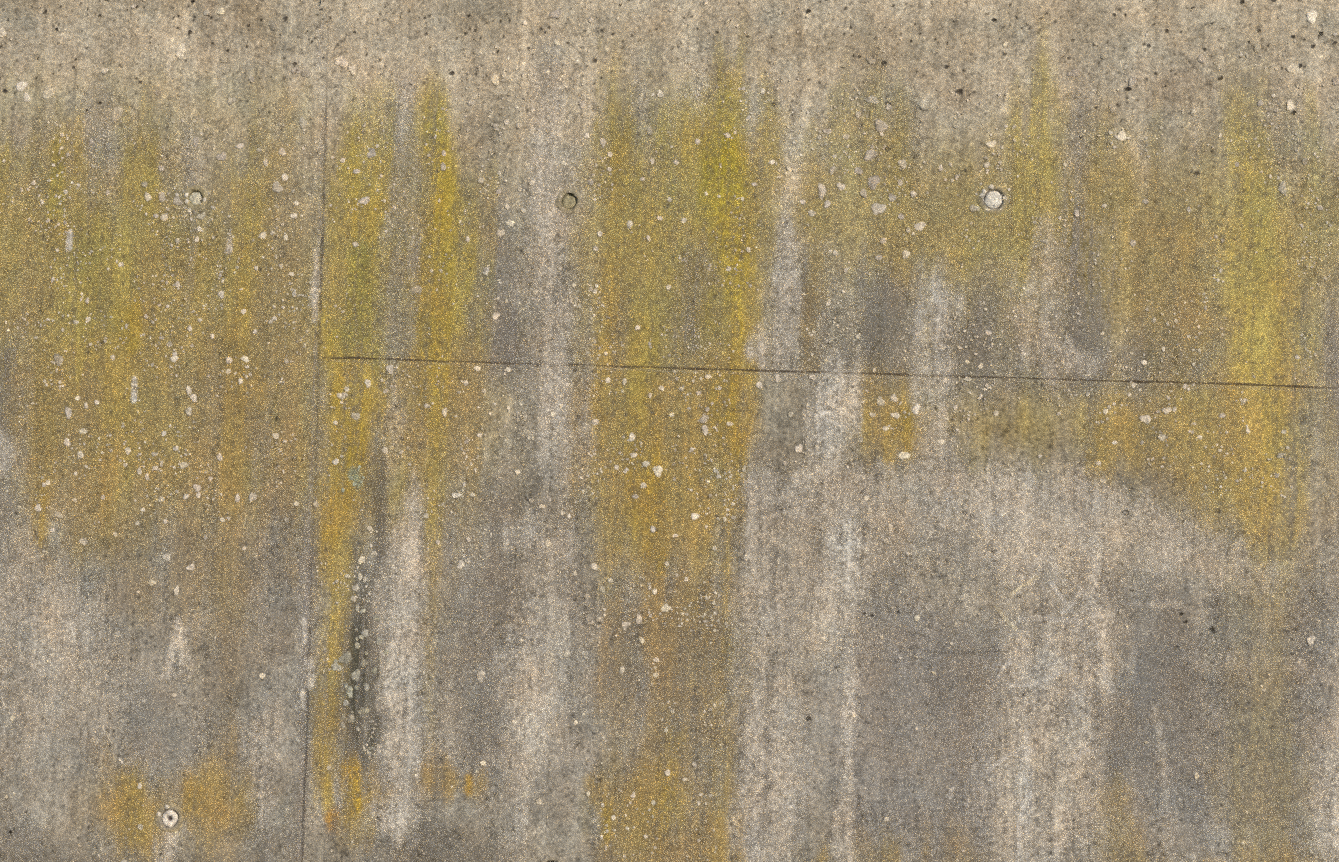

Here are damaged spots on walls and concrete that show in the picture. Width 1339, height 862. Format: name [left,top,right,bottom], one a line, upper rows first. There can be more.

water stain [48,139,72,250]
water stain [139,152,156,219]
water stain [132,255,172,427]
water stain [226,197,258,341]
water stain [419,278,478,447]
water stain [477,60,585,464]
water stain [1163,290,1257,508]
water stain [279,140,432,862]
water stain [627,128,1224,862]
water stain [0,577,97,719]
water stain [444,508,575,826]